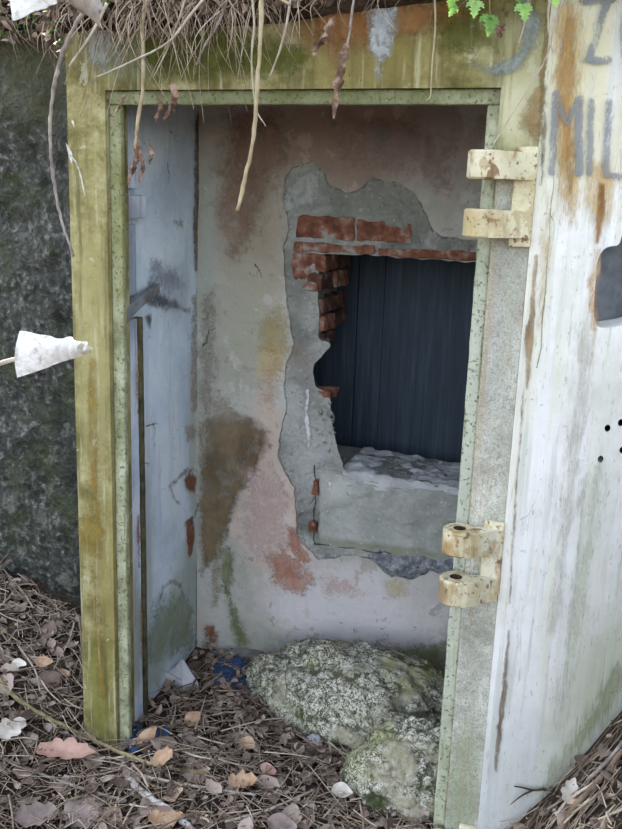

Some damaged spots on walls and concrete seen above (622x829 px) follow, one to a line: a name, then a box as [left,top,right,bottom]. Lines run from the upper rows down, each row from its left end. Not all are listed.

rust [520,0,583,222]
rust [588,162,612,243]
peeling [191,292,215,461]
spalling [278,162,477,580]
water stain [194,399,265,601]